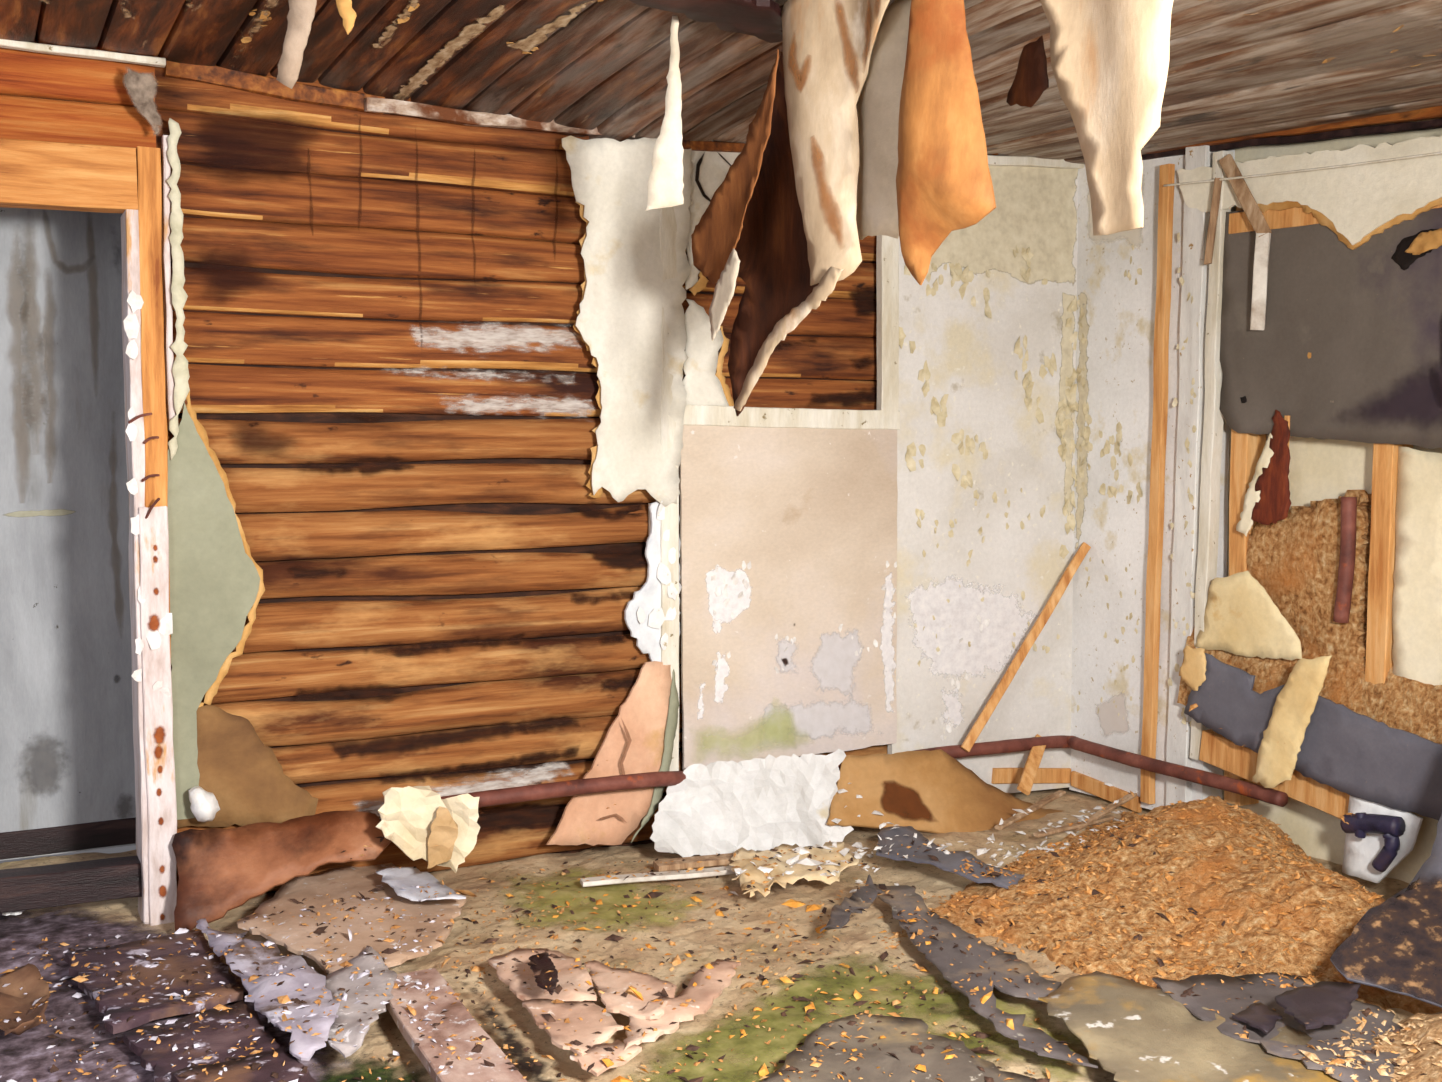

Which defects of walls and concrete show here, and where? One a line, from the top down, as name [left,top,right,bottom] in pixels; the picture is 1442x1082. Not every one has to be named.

peeling [372,0,420,48]
peeling [394,5,505,101]
peeling [506,0,603,54]
spalling [1258,198,1442,250]
peeling [904,166,1143,610]
water stain [1361,321,1442,426]
peeling [763,327,1060,741]
flaking render [624,501,682,662]
peeling [705,561,751,633]
peeling [697,651,731,719]
peeling [1096,655,1135,736]
water stain [26,741,57,790]